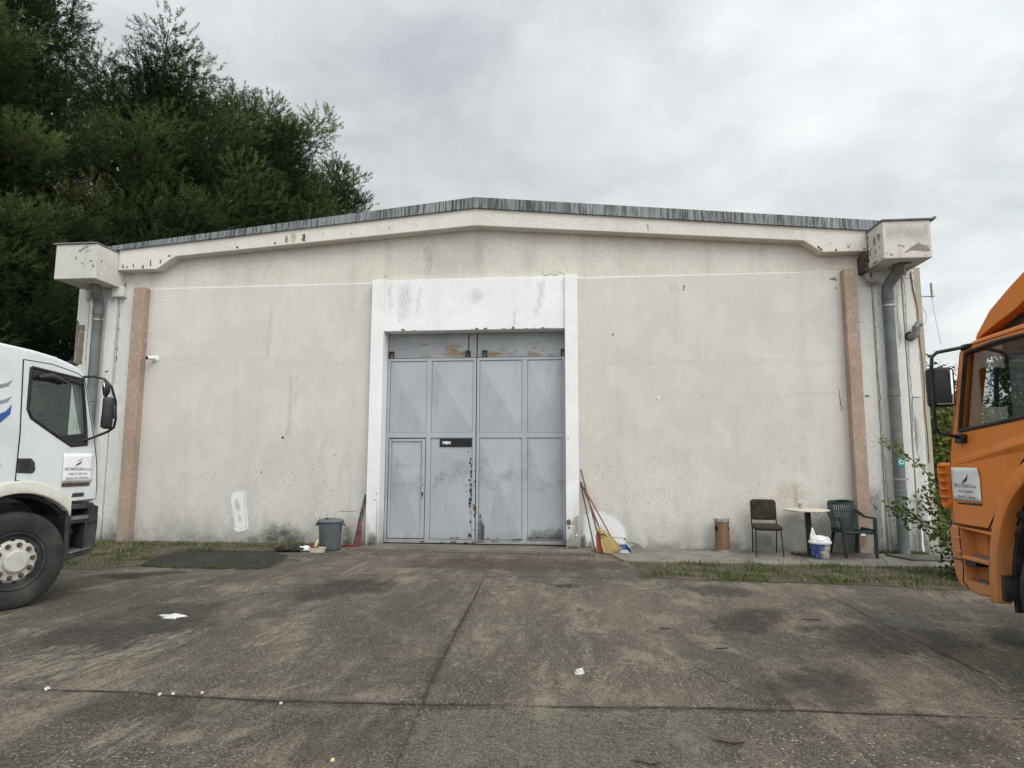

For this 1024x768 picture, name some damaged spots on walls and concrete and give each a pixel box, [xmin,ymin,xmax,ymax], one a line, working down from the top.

peeling [863,230,930,275]